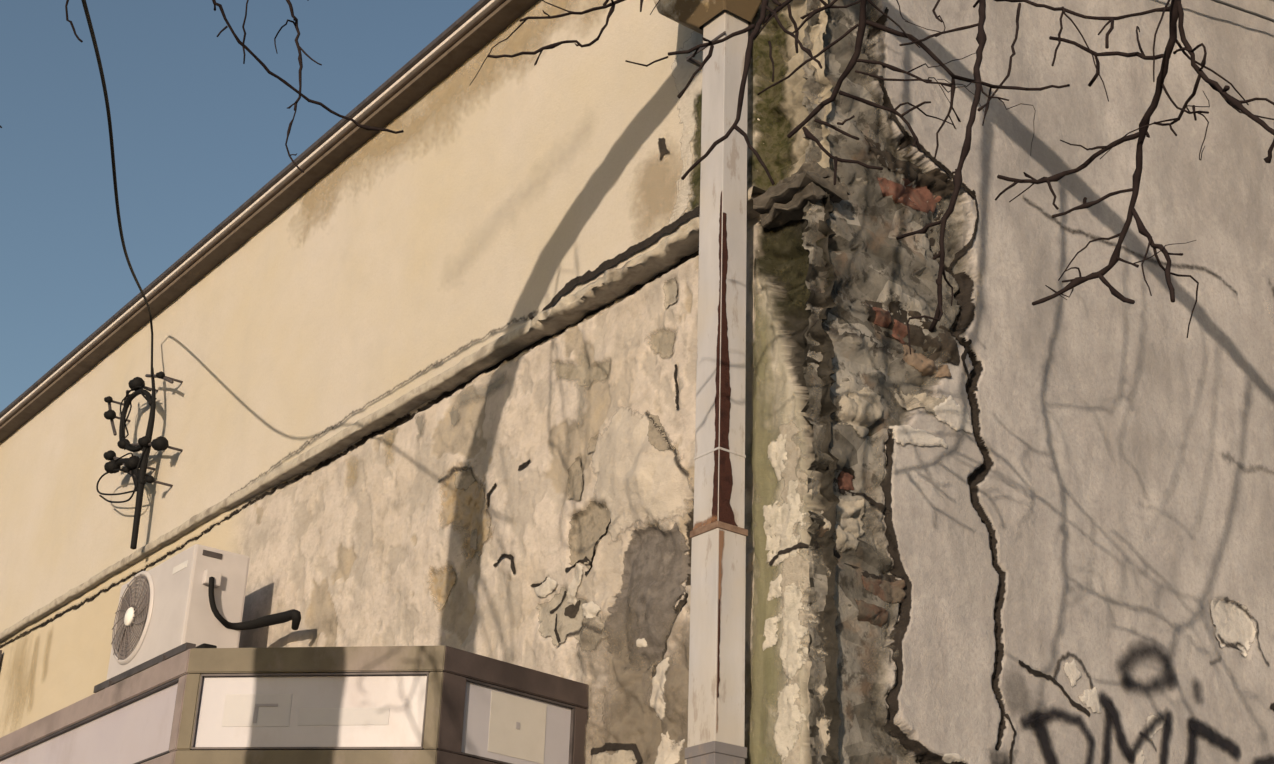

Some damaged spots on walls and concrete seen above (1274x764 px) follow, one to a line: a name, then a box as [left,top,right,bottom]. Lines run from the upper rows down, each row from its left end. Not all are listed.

crack [1024,198,1236,292]
spalling [663,278,678,308]
spalling [553,346,610,425]
spalling [649,329,675,358]
spalling [763,0,963,764]
crack [863,7,1101,764]
corrosion [693,191,738,697]
spalling [438,466,492,560]
spalling [430,567,457,610]
spalling [534,435,694,764]
spalling [1210,597,1269,666]